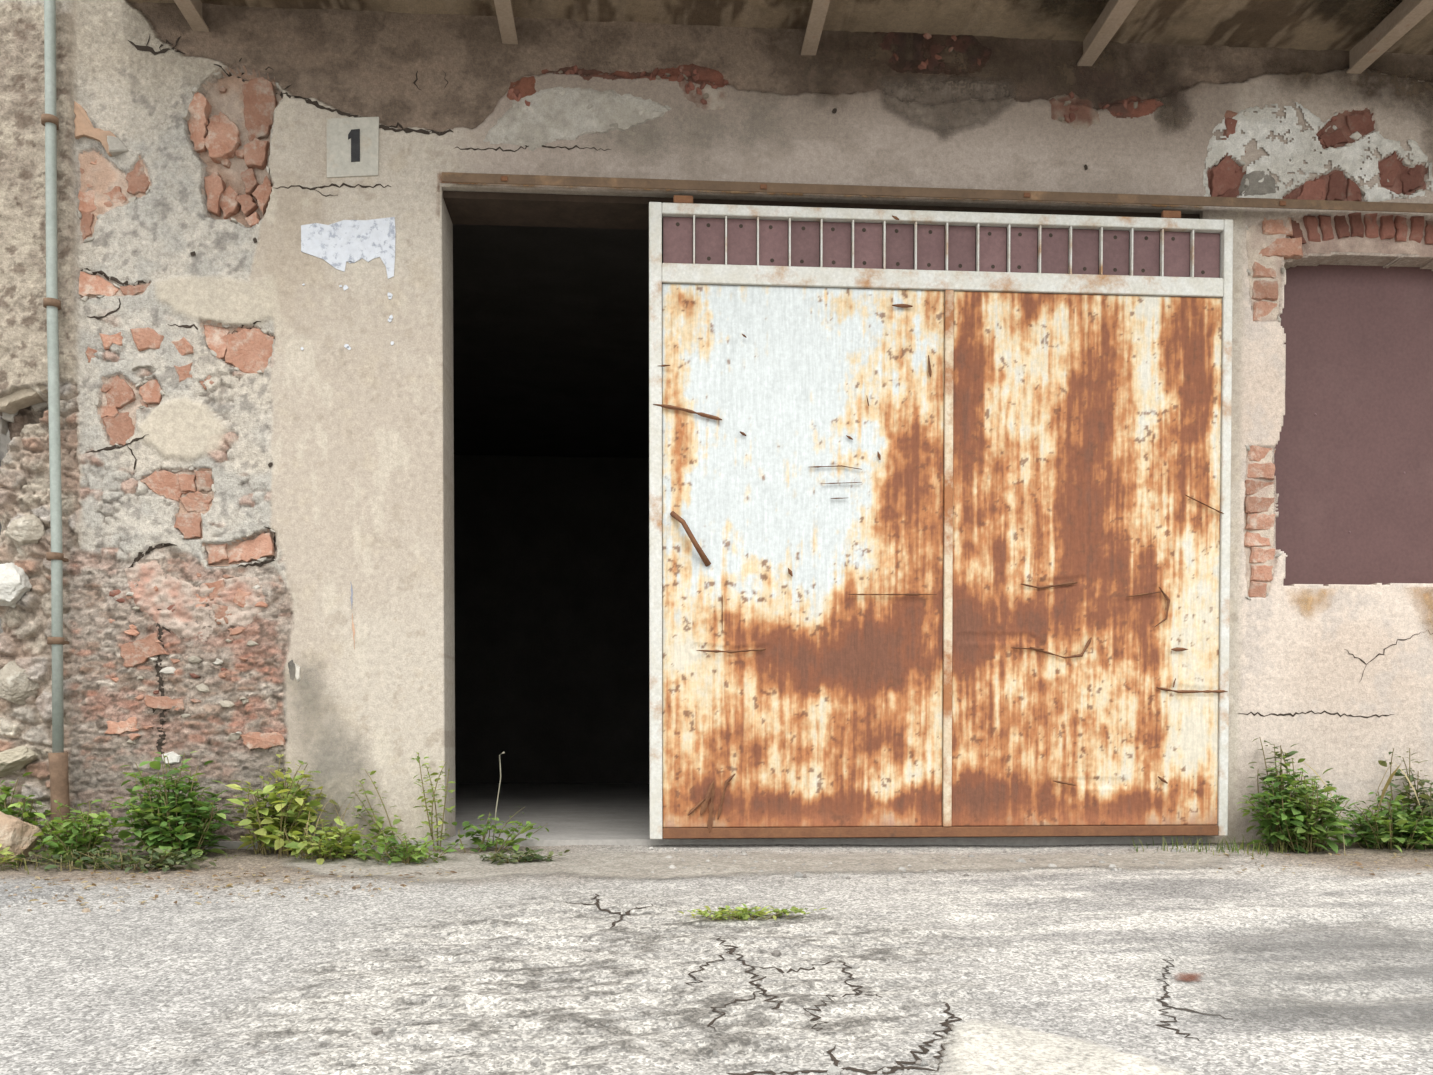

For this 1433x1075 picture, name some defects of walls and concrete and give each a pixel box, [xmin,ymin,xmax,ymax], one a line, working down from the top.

flaking render [875,32,992,75]
flaking render [483,63,729,151]
flaking render [183,66,282,243]
flaking render [1203,102,1433,322]
peeling [85,332,123,363]
flaking render [171,320,275,390]
flaking render [94,357,165,446]
spalling [104,467,276,744]
spalling [227,732,286,750]